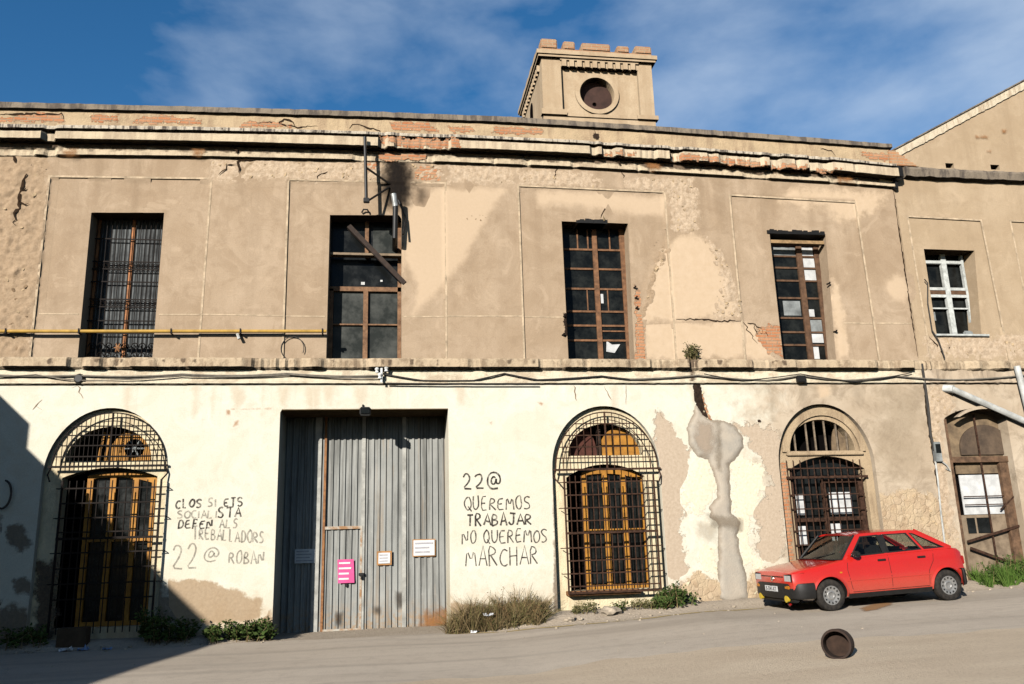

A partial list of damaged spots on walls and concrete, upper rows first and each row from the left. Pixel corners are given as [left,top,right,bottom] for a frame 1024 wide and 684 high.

crack [12,156,28,225]
flaking render [200,120,604,193]
water stain [0,142,880,242]
flaking render [618,171,783,360]
peeling [644,402,794,602]
flaking render [877,384,968,580]